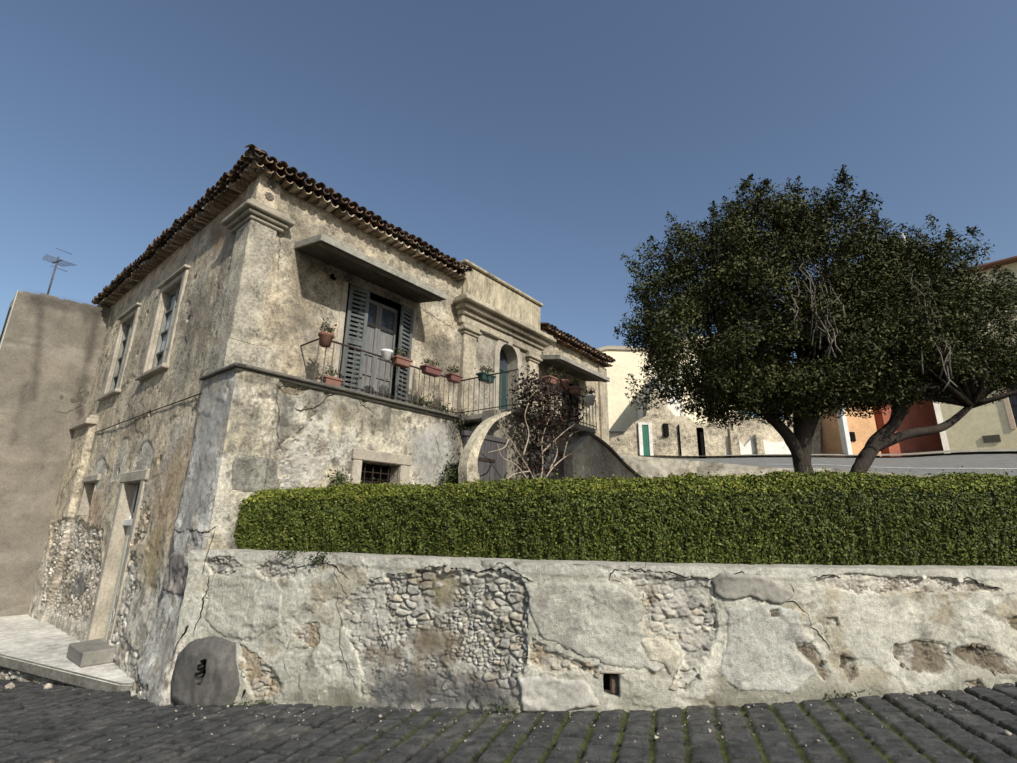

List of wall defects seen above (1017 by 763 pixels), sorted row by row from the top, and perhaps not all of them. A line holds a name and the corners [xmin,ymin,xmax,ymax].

spalling [37,516,103,623]
crack [172,527,216,656]
spalling [237,643,283,702]
spalling [342,565,601,711]
spalling [605,570,716,691]
spalling [892,639,1017,678]